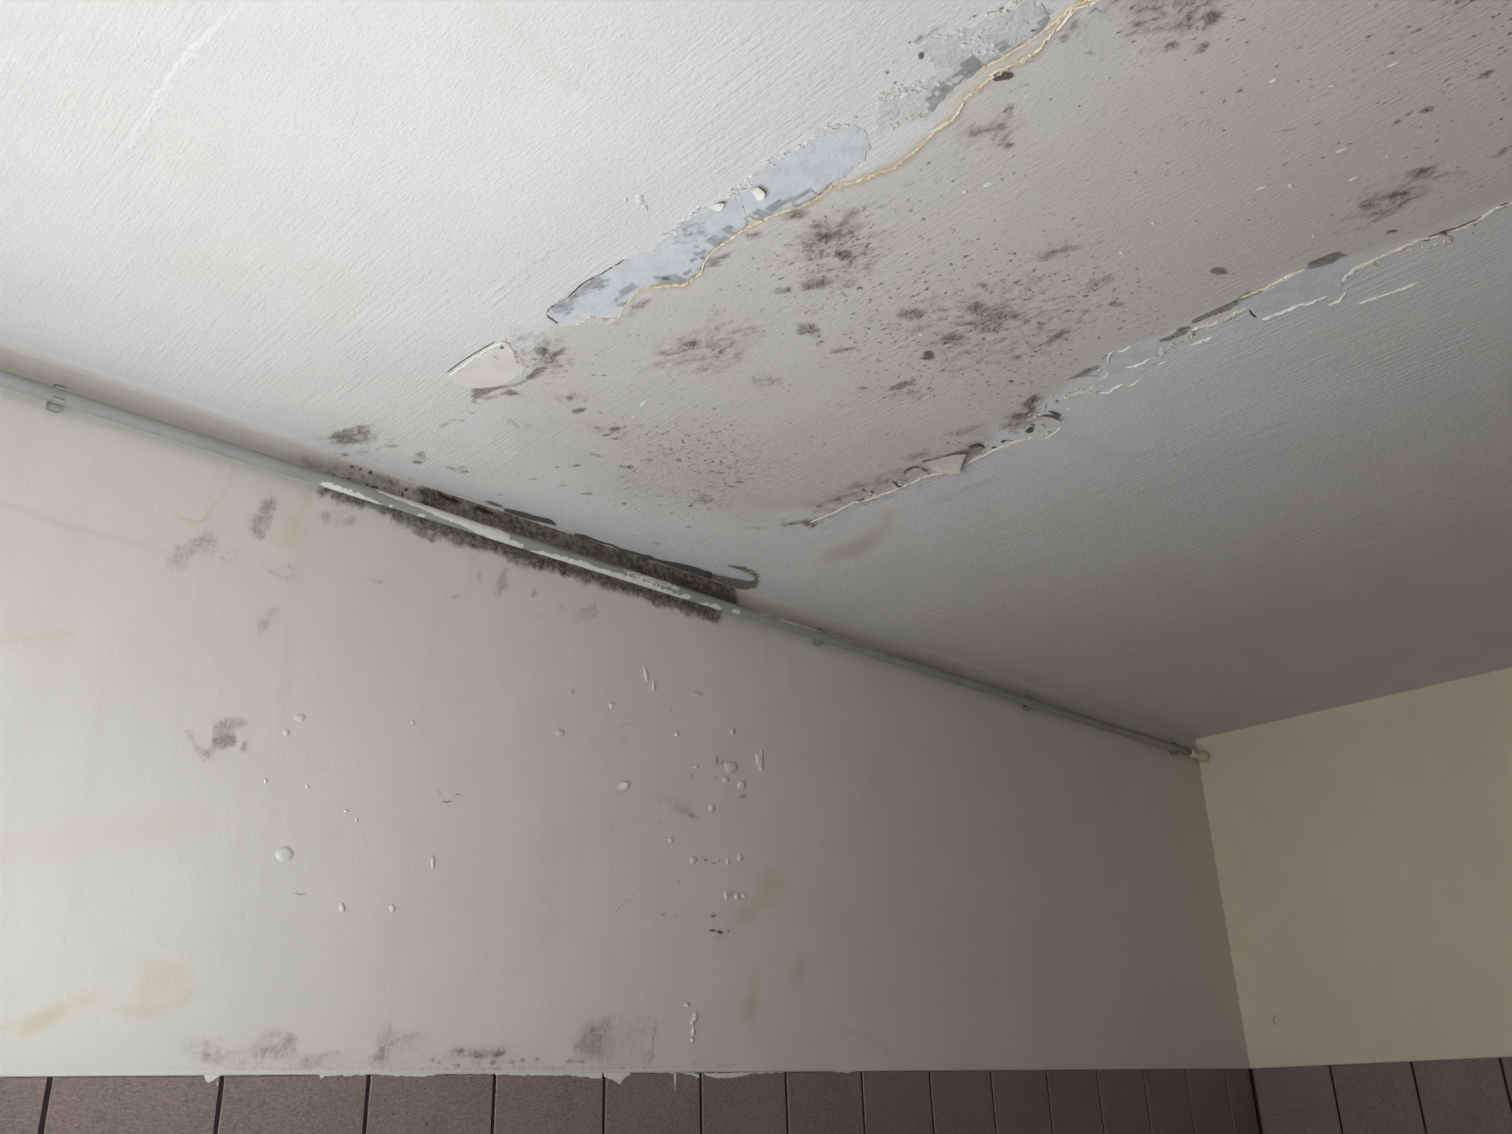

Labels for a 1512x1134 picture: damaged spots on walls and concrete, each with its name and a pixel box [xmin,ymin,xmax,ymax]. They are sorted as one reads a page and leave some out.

peeling [546,0,1055,326]
peeling [1225,254,1419,320]
peeling [1013,341,1184,439]
leakage [325,432,758,620]